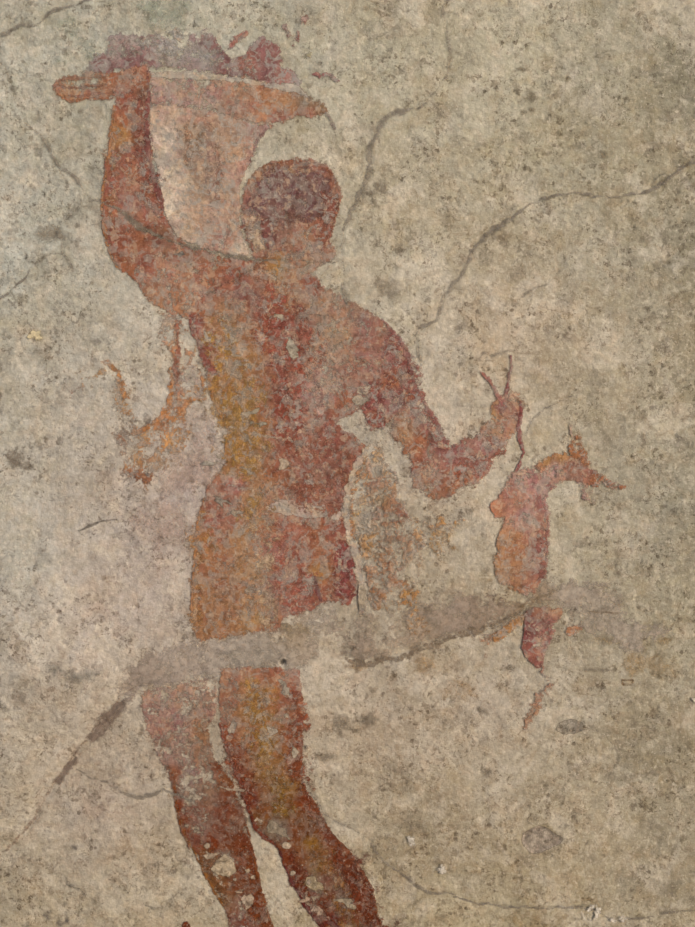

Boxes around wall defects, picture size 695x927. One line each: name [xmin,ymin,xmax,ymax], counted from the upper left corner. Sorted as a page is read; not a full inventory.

crack [0,0,85,37]
crack [342,0,452,231]
crack [0,231,72,299]
crack [26,124,275,262]
crack [415,159,695,365]
crack [77,769,192,802]